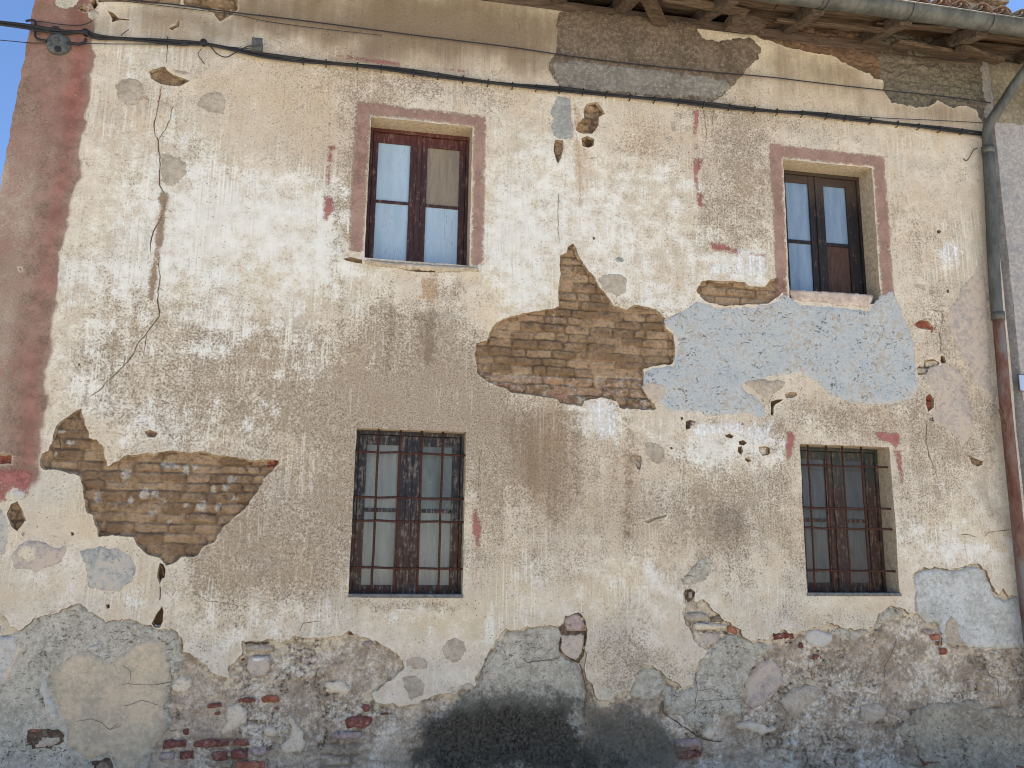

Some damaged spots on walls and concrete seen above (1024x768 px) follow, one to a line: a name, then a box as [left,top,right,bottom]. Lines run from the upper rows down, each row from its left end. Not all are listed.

flaking render [149,67,189,86]
flaking render [758,21,991,125]
flaking render [554,140,564,163]
flaking render [576,102,605,159]
crack [87,89,173,401]
flaking render [696,277,785,306]
flaking render [475,244,675,410]
flaking render [771,392,797,416]
flaking render [0,408,279,583]
flaking render [100,604,170,631]
peeling [148,588,1024,768]
flaking render [26,729,64,749]